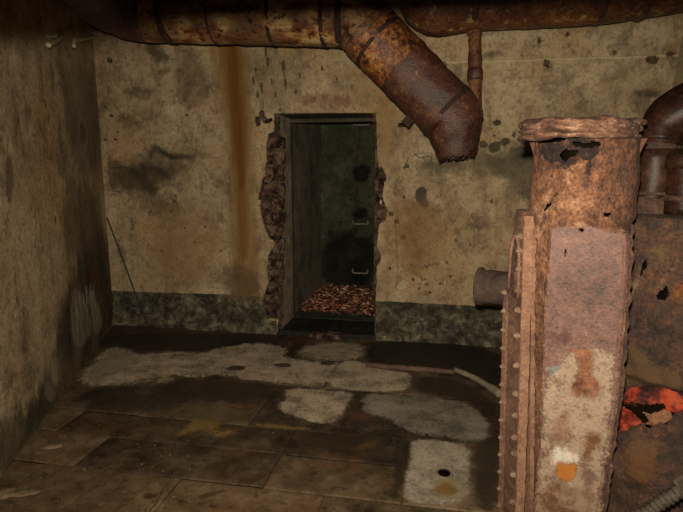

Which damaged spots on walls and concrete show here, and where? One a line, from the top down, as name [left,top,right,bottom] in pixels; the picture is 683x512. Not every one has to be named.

leakage [110,146,187,194]
corrosion [212,44,257,296]
flaking render [255,110,286,329]
flaking render [373,149,390,308]
leakage [117,333,277,350]
leakage [414,377,500,511]